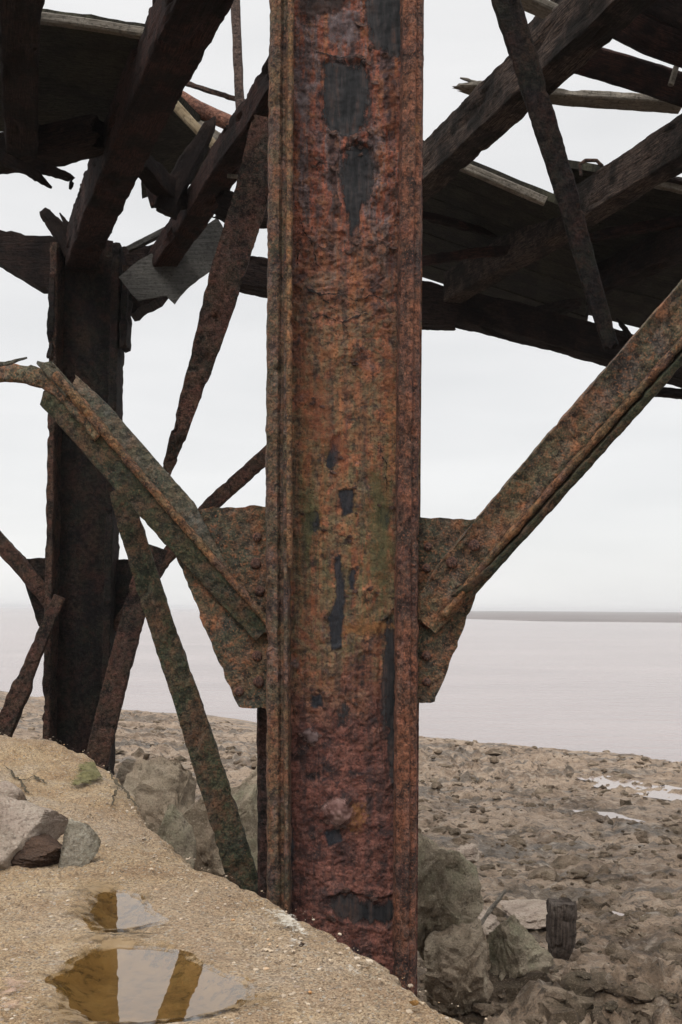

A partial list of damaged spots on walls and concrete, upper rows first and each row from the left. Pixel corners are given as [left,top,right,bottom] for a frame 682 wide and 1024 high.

peeling [319,0,401,255]
peeling [326,435,344,474]
peeling [339,486,358,516]
peeling [323,554,359,650]